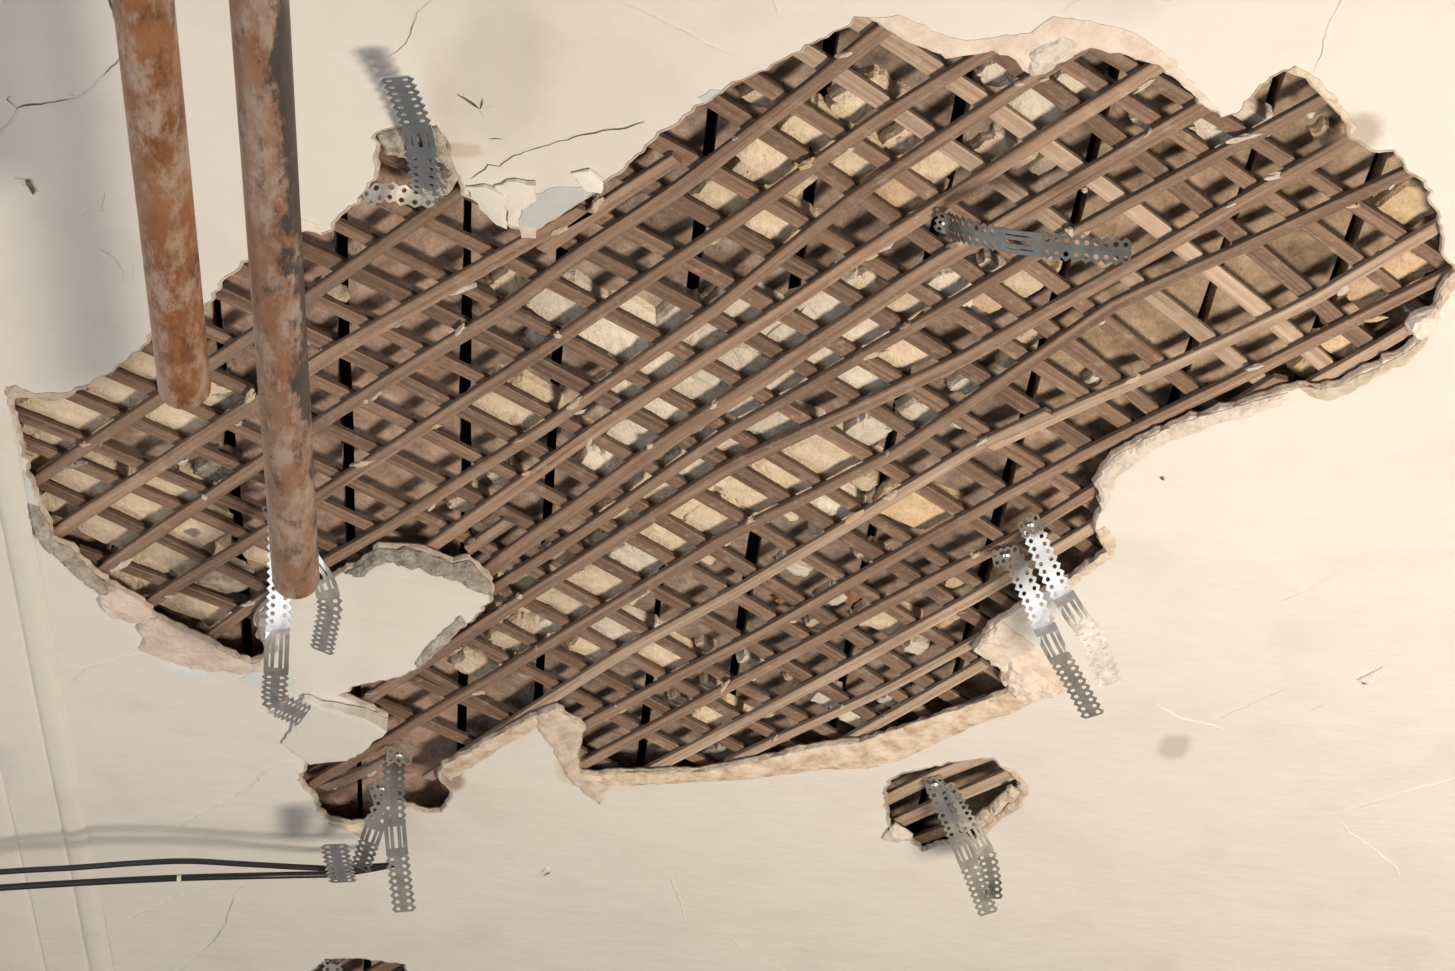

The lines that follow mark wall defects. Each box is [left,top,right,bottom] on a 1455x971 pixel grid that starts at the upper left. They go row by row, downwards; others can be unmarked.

crack [0,0,119,135]
crack [380,0,435,63]
spalling [15,178,35,195]
spalling [301,15,1455,852]
spalling [4,332,495,840]
spalling [311,958,407,971]